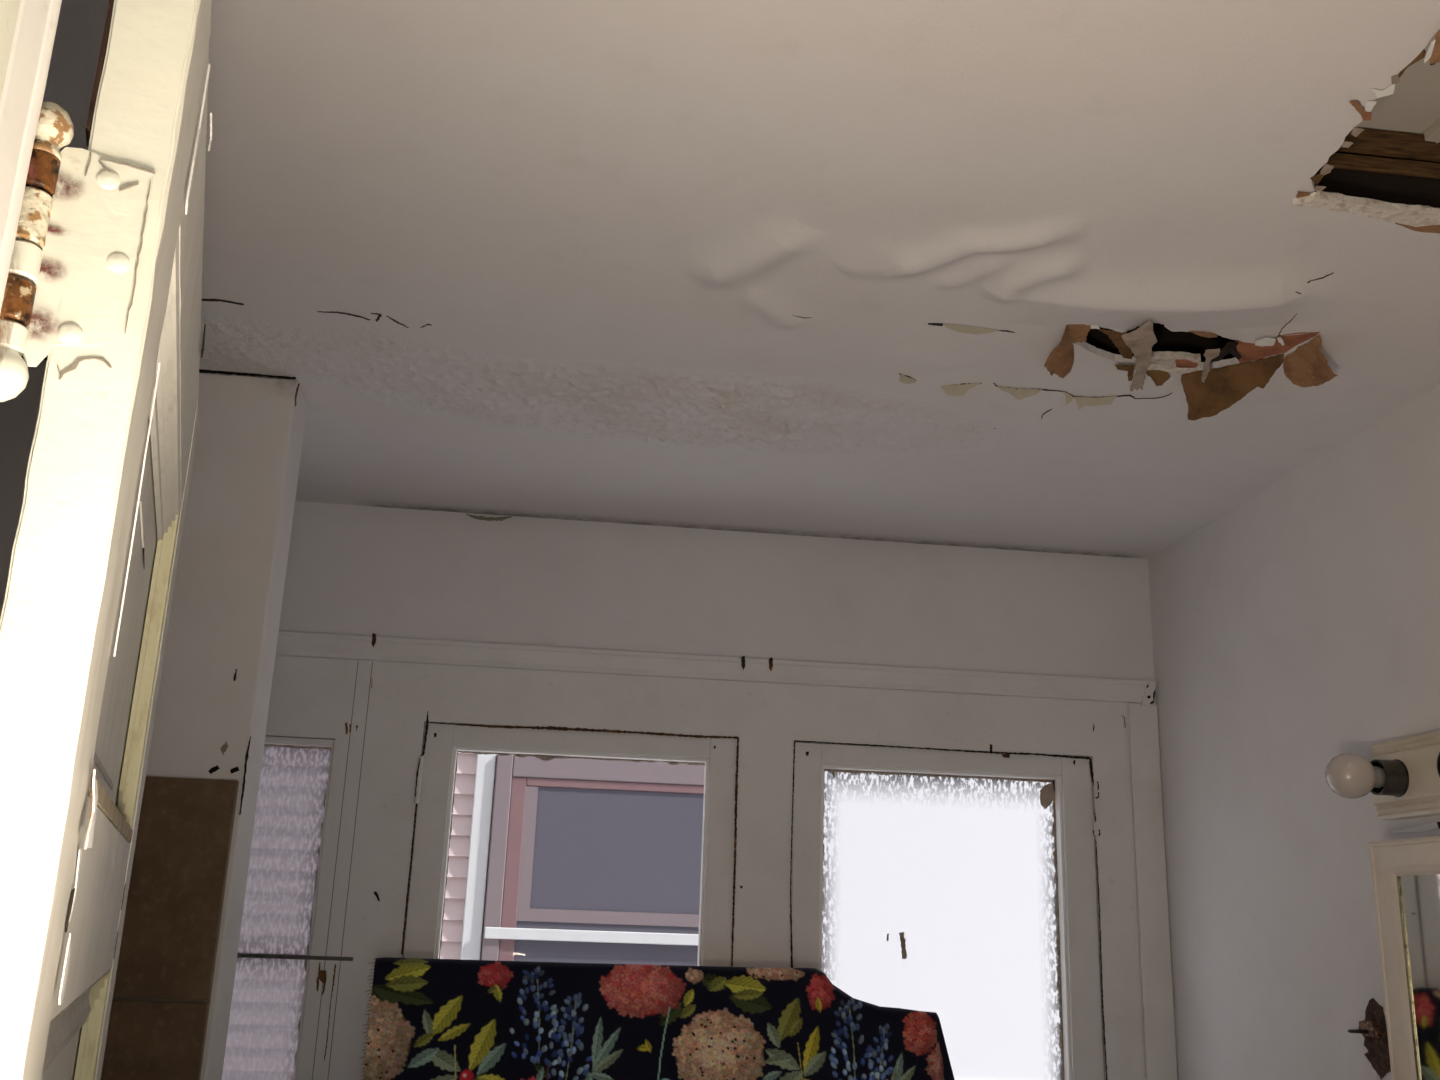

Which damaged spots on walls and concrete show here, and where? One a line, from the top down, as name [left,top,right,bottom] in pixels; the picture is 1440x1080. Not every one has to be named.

corrosion [28,161,37,182]
corrosion [40,261,60,277]
corrosion [0,283,13,342]
corrosion [30,314,50,335]
crack [202,298,244,306]
crack [317,311,432,328]
spalling [1114,351,1201,373]
peeling [941,383,1173,409]
peeling [58,768,98,1005]